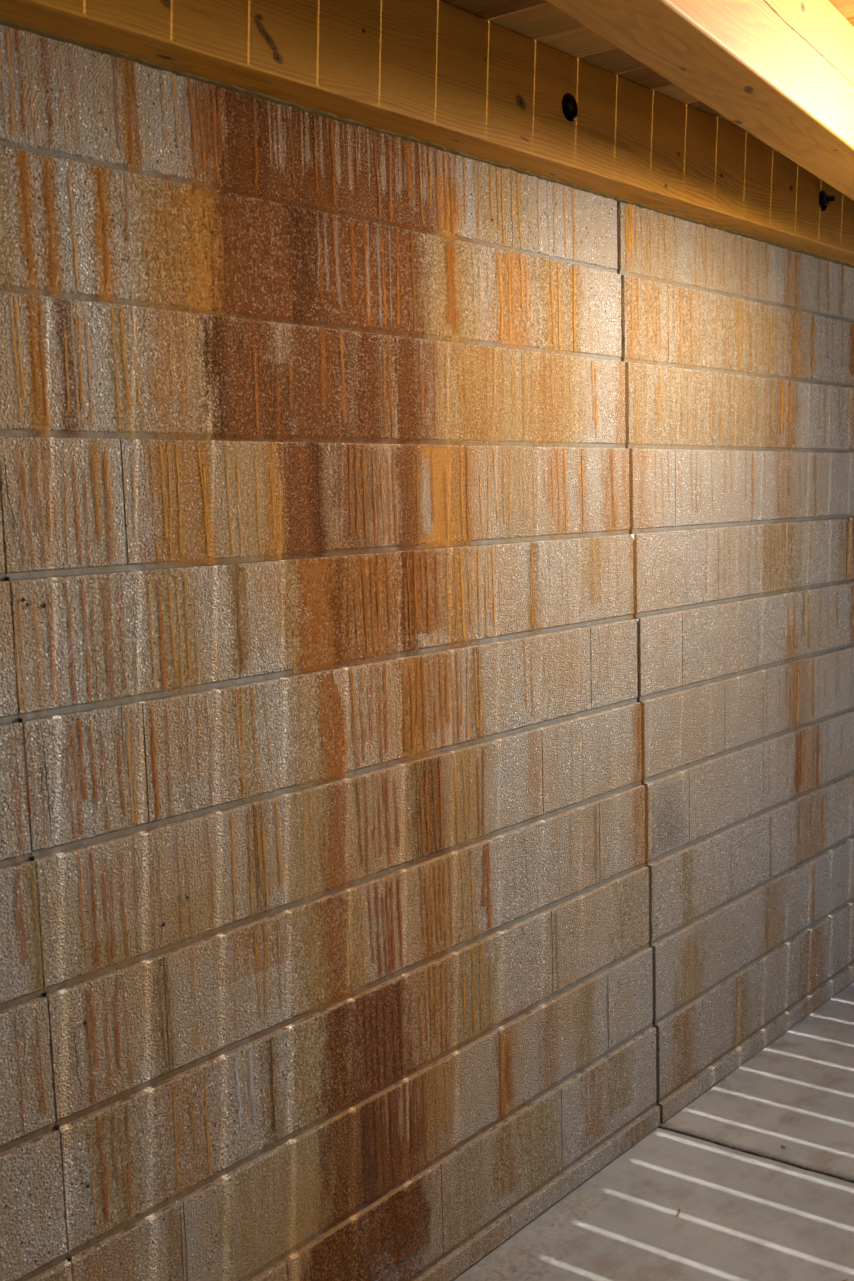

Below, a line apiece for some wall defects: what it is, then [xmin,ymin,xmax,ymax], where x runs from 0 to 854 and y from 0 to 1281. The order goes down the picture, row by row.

rust [0,29,111,567]
rust [623,205,682,317]
rust [628,252,843,493]
rust [11,730,45,849]
rust [15,581,138,710]
rust [68,712,138,837]
rust [86,58,576,1281]
rust [787,595,824,852]
rust [78,840,162,965]
rust [14,1014,46,1131]